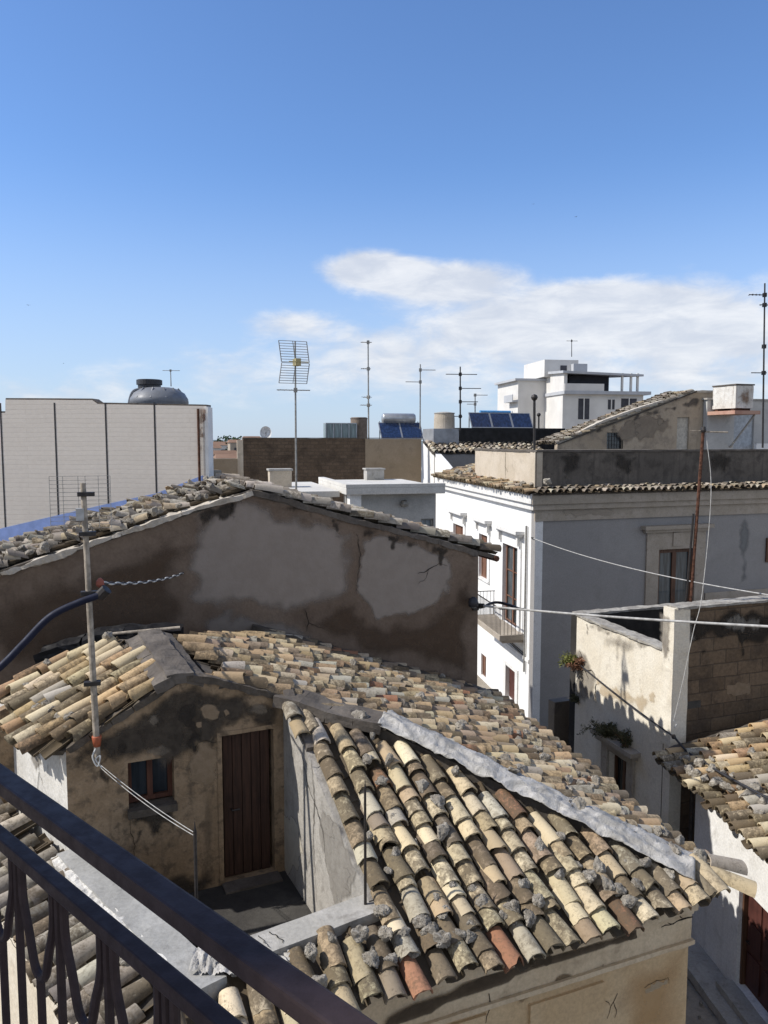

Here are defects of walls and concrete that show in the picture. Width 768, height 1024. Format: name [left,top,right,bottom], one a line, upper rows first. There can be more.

damp [136,813,173,841]